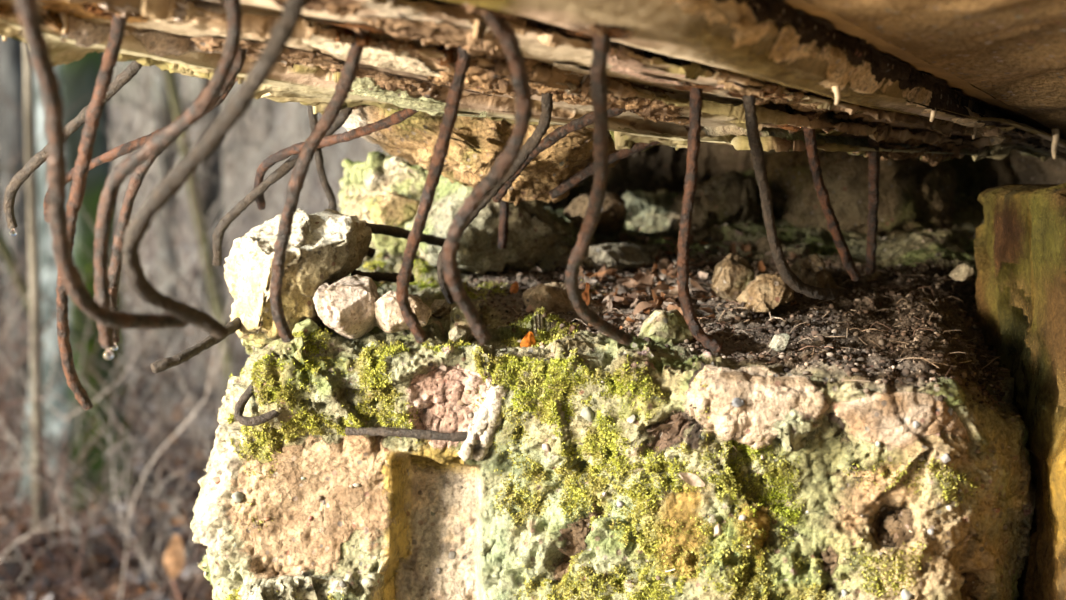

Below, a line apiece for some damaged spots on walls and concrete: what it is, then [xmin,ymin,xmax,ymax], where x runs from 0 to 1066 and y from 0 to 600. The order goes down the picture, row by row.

corrosion [40,0,113,29]
corrosion [322,22,387,50]
corrosion [434,44,459,68]
corrosion [566,28,632,39]
corrosion [662,78,822,132]
spalling [3,0,976,454]
damp [1012,280,1038,366]
damp [1056,375,1066,413]
damp [195,411,245,552]
damp [789,431,860,540]
damp [474,438,532,600]